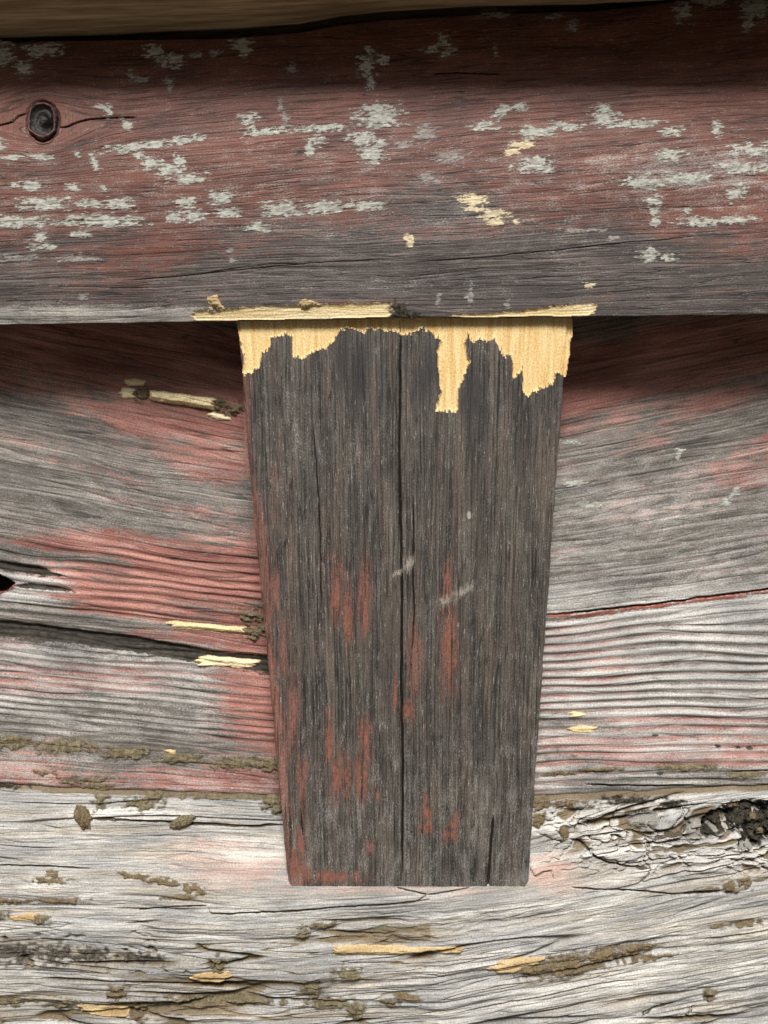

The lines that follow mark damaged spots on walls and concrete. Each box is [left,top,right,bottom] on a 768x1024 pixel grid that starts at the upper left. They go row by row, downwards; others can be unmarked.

peeling [0,41,65,75]
peeling [126,37,256,93]
peeling [236,46,439,165]
peeling [0,103,393,262]
peeling [466,102,768,227]
spalling [455,193,520,226]
crack [125,259,378,281]
peeling [554,228,620,242]
peeling [634,247,680,263]
spalling [190,282,597,413]
crack [546,588,768,615]
spalling [699,800,768,850]